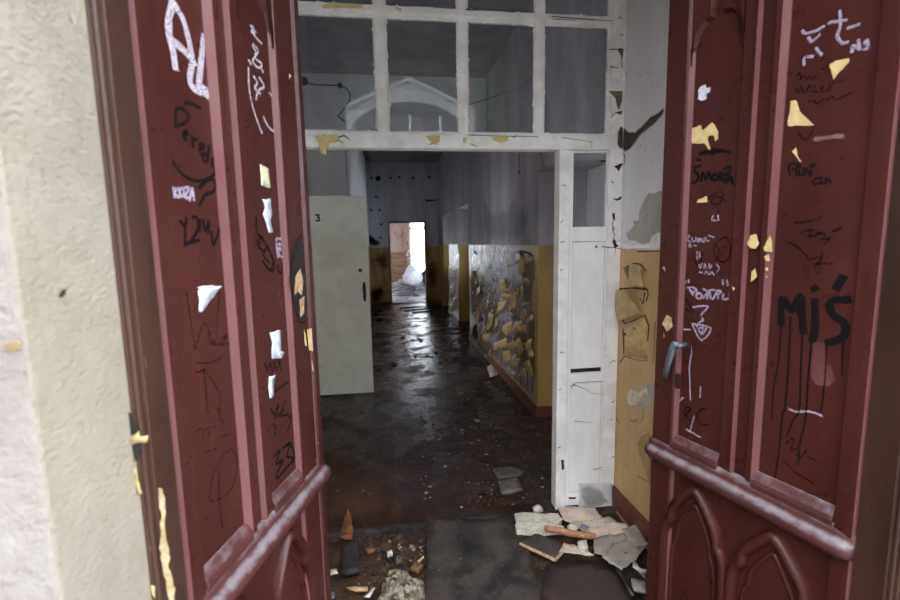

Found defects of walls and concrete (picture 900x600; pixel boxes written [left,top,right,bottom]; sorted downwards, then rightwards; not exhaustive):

peeling [610,91,622,114]
peeling [314,135,339,155]
flaking render [612,191,662,252]
peeling [449,244,535,398]
flaking render [626,382,655,486]